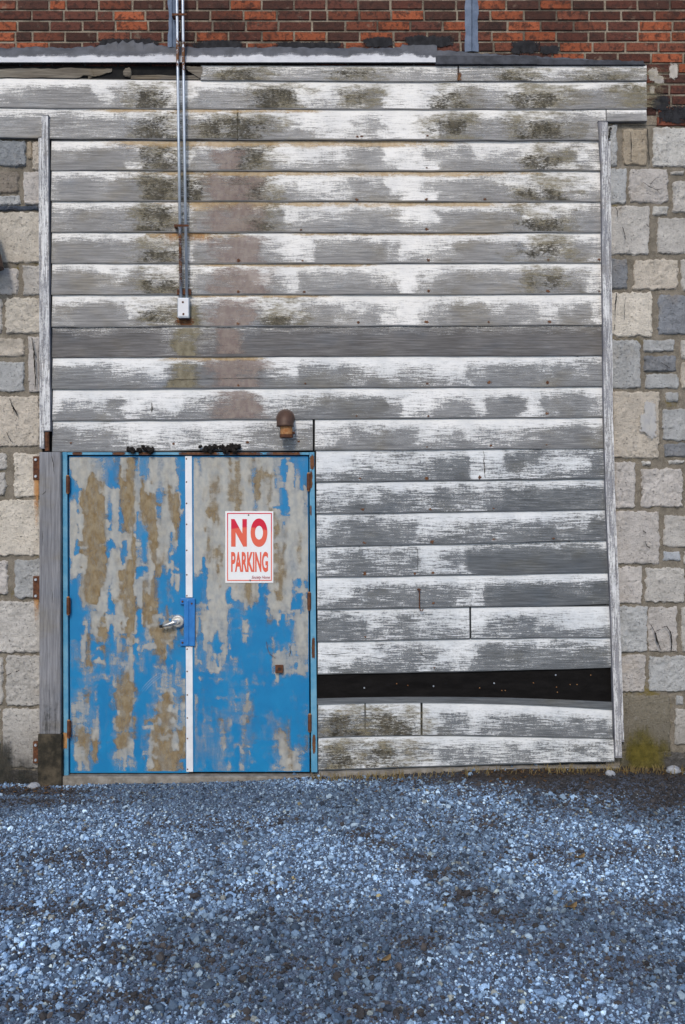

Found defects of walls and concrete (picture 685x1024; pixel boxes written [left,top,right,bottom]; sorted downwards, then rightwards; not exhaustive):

rust [169,150,275,419]
water stain [103,67,504,388]
peeling [0,53,678,771]
water stain [495,67,664,293]
water stain [317,704,432,769]
crack [650,624,672,651]